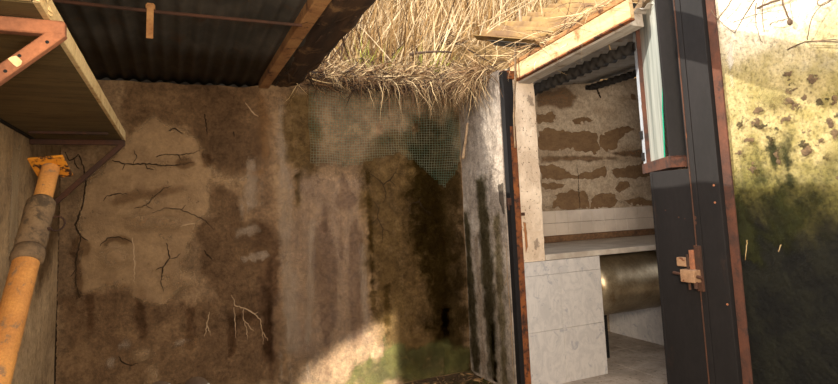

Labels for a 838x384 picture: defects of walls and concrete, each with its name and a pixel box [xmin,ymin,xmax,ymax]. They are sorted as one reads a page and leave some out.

crack [112,114,208,170]
peeling [536,110,634,155]
peeling [539,161,652,210]
crack [54,150,213,384]
leakage [405,117,497,382]